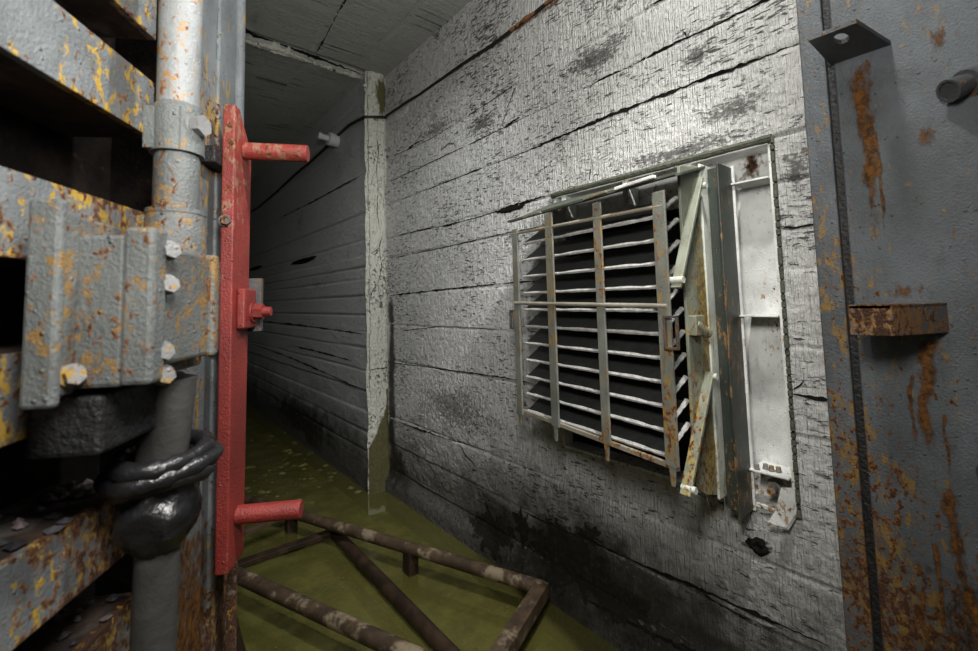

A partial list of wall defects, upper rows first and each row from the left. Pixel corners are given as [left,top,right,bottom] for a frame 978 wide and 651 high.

rust [509,0,559,36]
crack [590,0,770,86]
crack [282,43,799,301]
rust [850,60,885,217]
rust [695,217,711,376]
rust [705,403,717,480]
rust [907,341,950,465]
water stain [470,493,738,651]